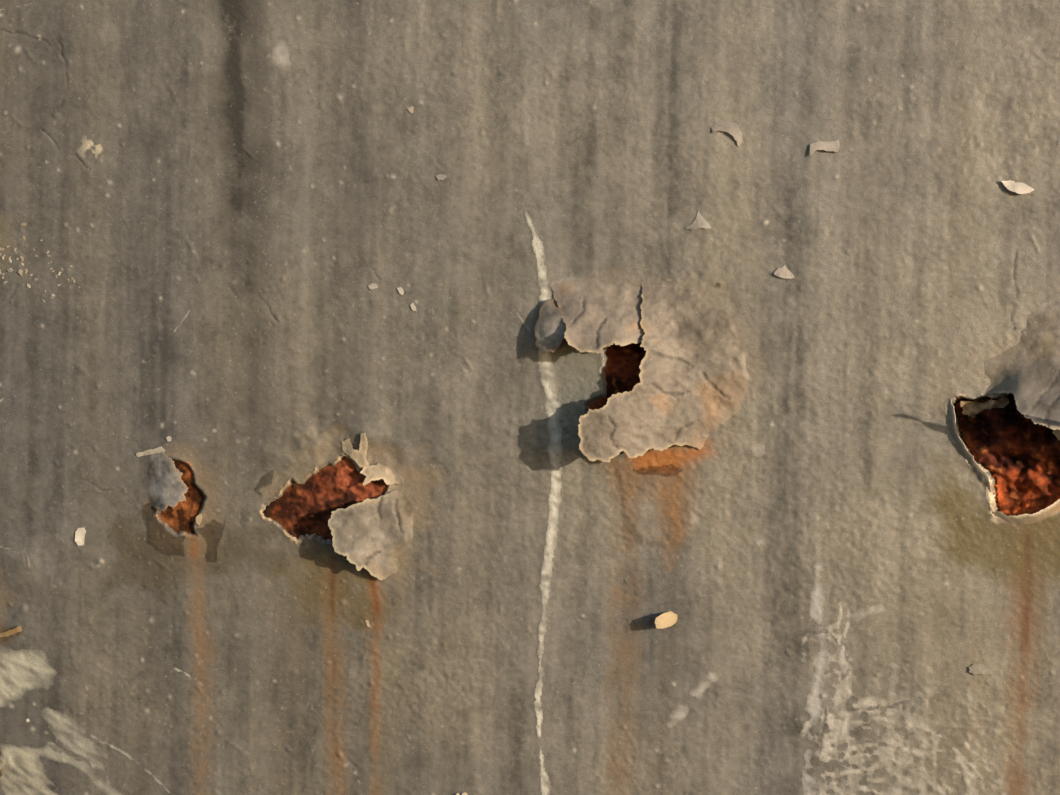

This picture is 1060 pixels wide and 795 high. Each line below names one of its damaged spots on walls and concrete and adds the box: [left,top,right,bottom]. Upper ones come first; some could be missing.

rust [0,210,80,303]
water stain [525,211,556,308]
peeling [136,436,228,556]
rust [101,503,406,795]
peeling [246,422,447,599]
water stain [533,348,563,795]
peeling [535,266,767,477]
water stain [798,562,1000,795]
peeling [923,298,1060,525]